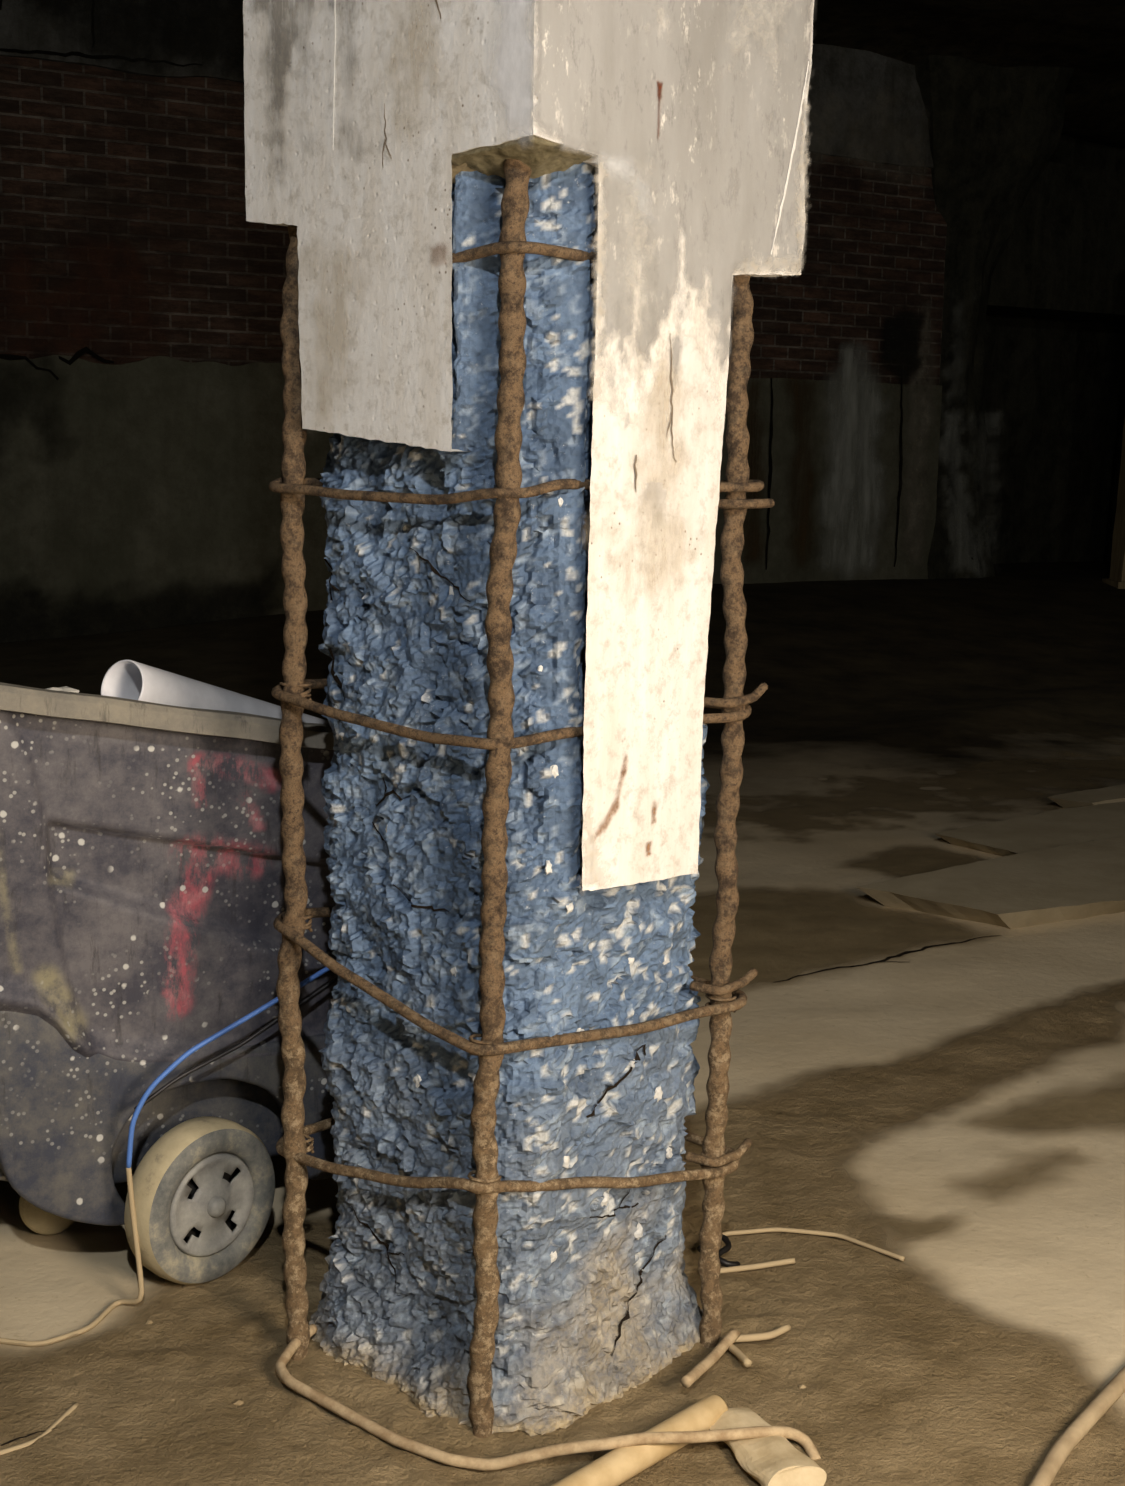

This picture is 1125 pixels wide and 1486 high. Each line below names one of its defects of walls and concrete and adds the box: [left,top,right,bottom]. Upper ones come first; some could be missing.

spalling [309,171,506,1427]
corrosion [596,797,619,835]
spalling [490,0,812,1436]